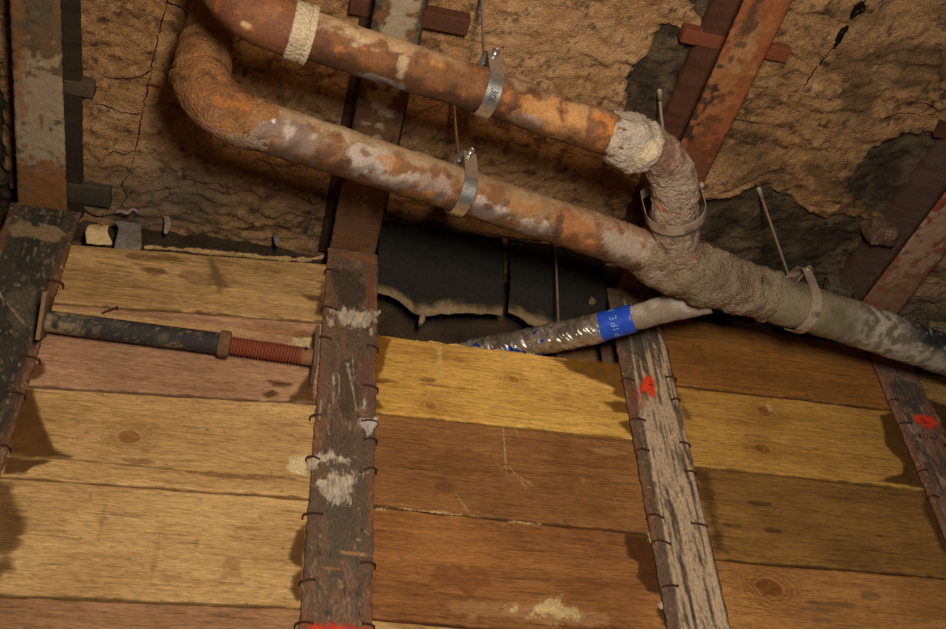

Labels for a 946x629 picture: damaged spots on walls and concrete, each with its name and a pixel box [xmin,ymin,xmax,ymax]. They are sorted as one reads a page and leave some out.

crack [94,0,187,208]
spalling [624,24,691,123]
spalling [689,0,710,18]
crack [803,0,866,88]
spalling [698,131,937,289]